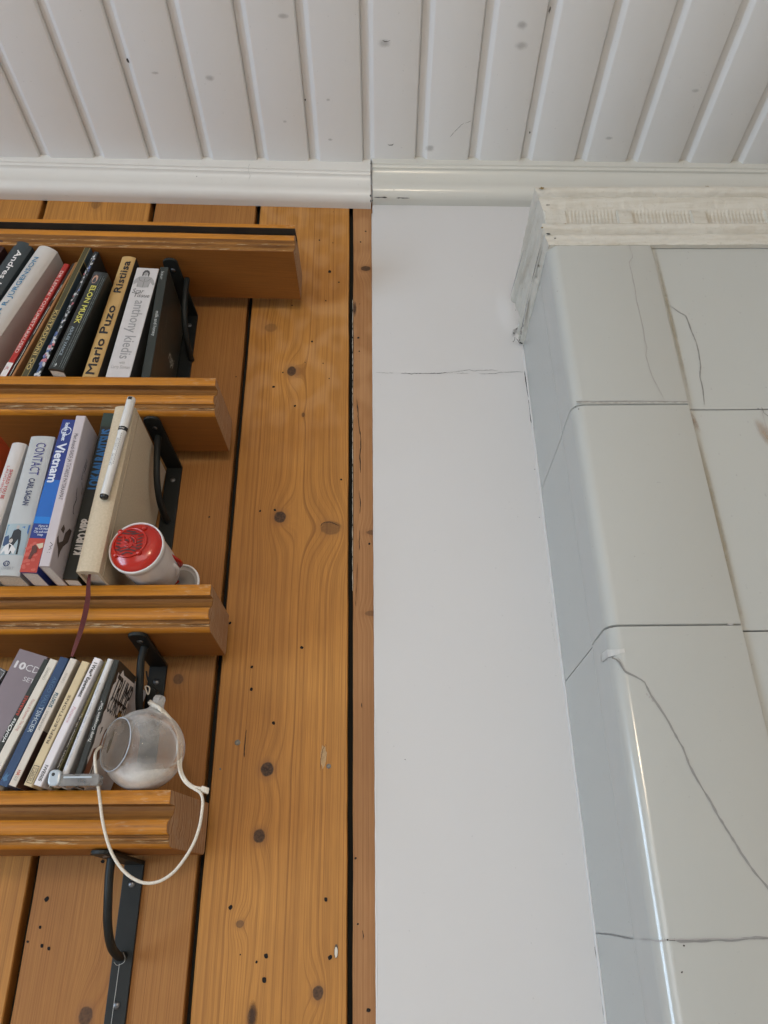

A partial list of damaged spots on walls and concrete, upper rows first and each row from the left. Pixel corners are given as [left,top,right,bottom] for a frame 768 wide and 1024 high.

crack [376,370,531,421]
crack [666,303,704,399]
crack [612,657,768,889]
crack [594,933,768,955]